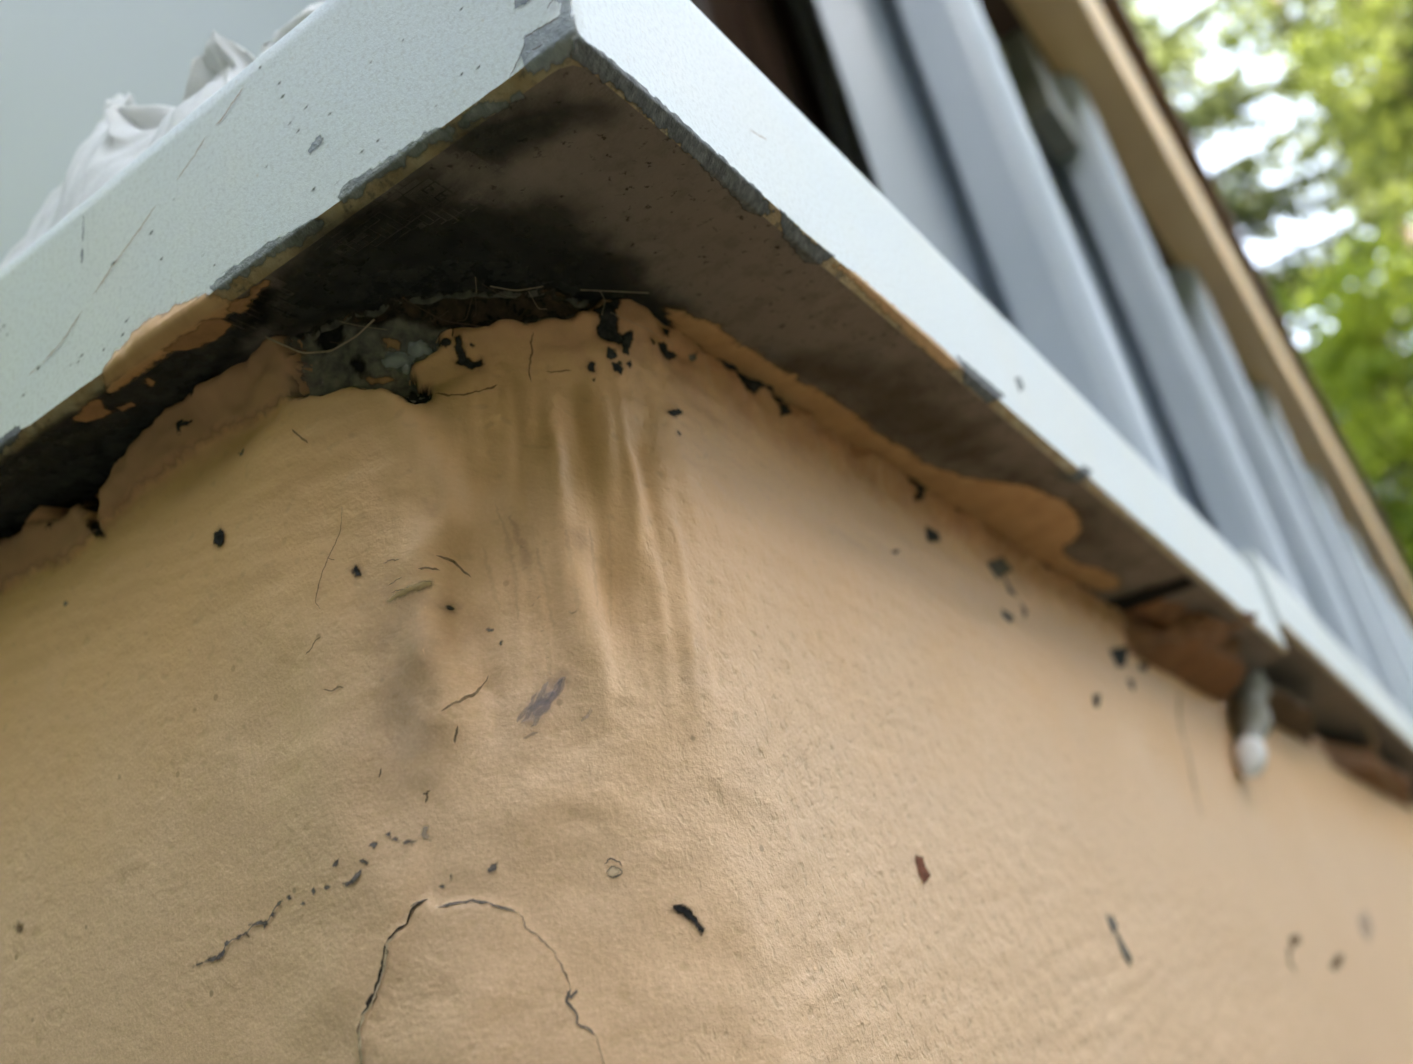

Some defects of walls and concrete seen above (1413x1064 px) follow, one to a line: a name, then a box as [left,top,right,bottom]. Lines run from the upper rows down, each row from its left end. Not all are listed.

leakage [453,104,597,164]
leakage [0,173,684,537]
spalling [285,287,698,404]
peeling [717,358,792,416]
spalling [956,355,1004,403]
spalling [0,426,22,455]
spalling [1056,465,1092,482]
spalling [46,474,109,537]
spalling [213,529,224,546]
peeling [926,527,940,541]
crack [196,790,430,966]
crack [357,899,604,1064]